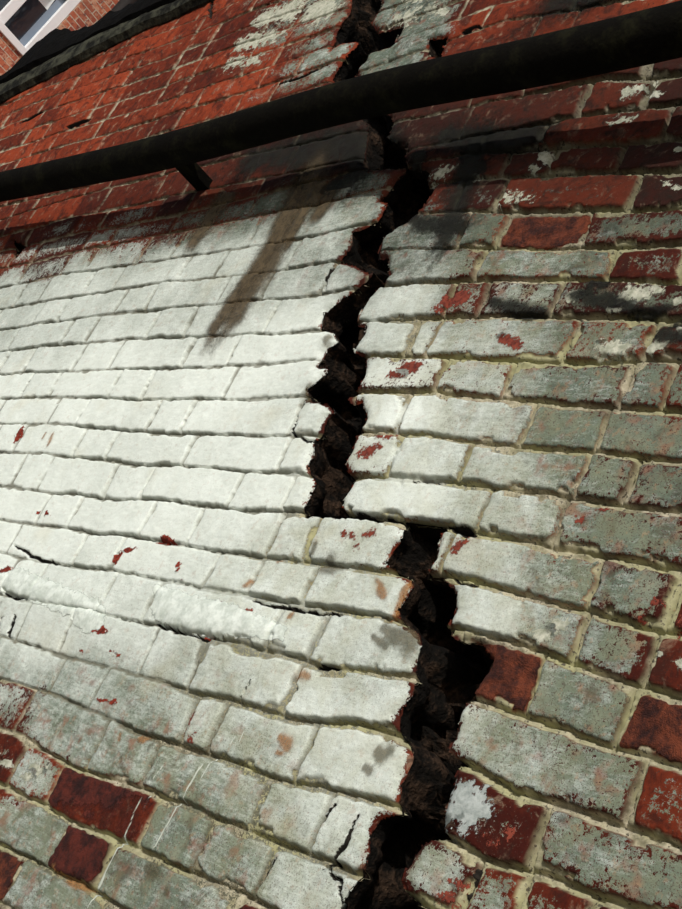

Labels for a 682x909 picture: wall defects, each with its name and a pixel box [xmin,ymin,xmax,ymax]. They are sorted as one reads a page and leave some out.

crack [279,0,404,85]
crack [462,25,482,35]
leakage [531,0,604,33]
spalling [501,215,591,251]
peeling [491,333,524,351]
crack [292,115,494,909]
peeling [450,537,469,554]
crack [252,600,341,617]
spalling [475,644,540,711]
spalling [619,696,682,763]
spalling [48,768,152,881]
spalling [0,852,21,900]